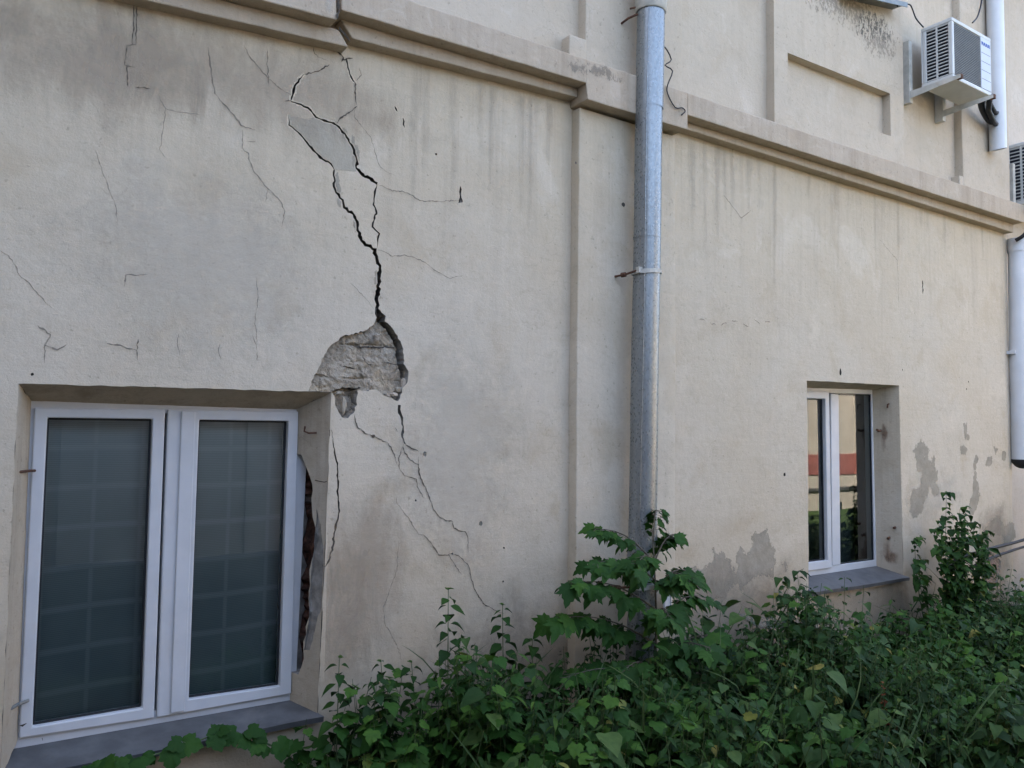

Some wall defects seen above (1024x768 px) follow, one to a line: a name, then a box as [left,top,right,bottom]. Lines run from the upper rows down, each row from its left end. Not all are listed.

crack [124,7,199,157]
crack [208,50,285,223]
crack [244,0,457,317]
flaking render [309,308,408,418]
flaking render [292,468,326,674]
crack [315,435,340,567]
crack [354,405,504,658]